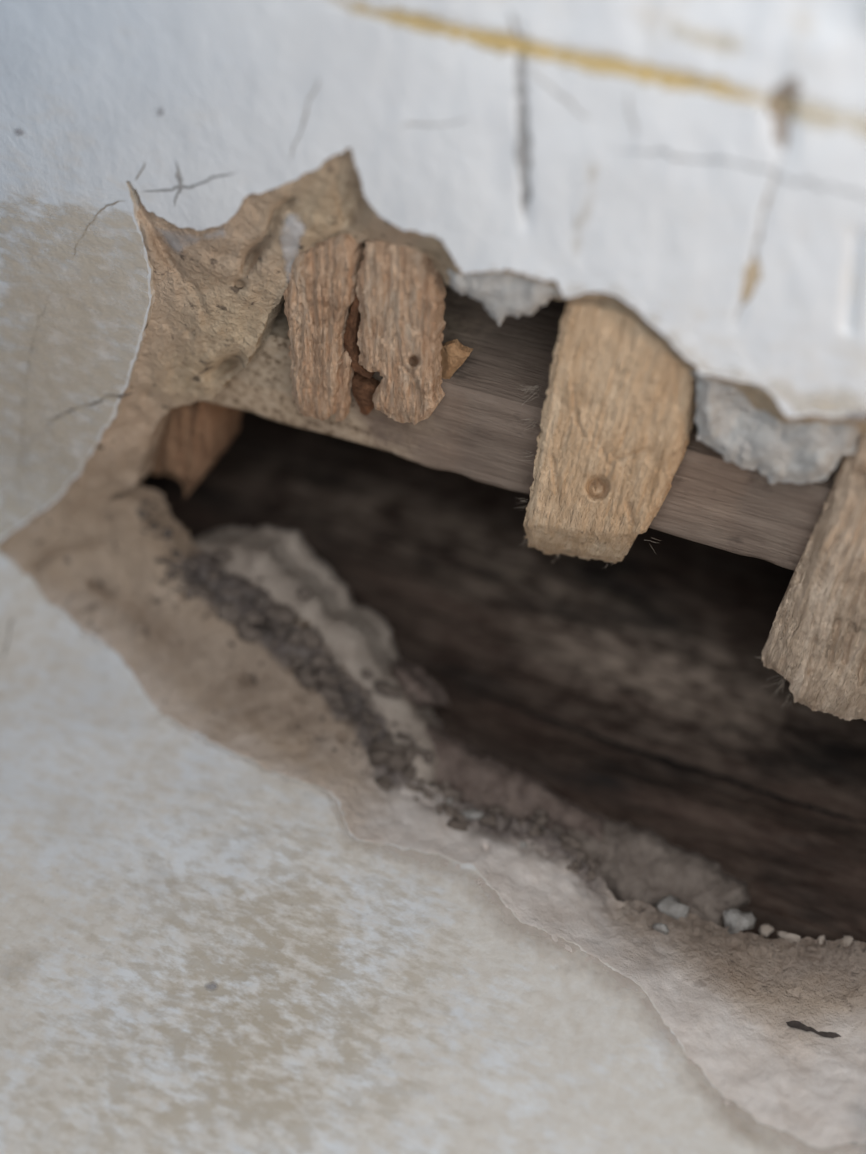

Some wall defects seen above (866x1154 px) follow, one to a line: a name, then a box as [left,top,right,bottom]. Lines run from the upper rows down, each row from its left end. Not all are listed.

spalling [165,232,179,250]
spalling [282,215,304,271]
spalling [447,269,560,326]
spalling [690,369,866,484]
spalling [217,600,265,643]
spalling [263,605,323,651]
spalling [287,652,356,714]
spalling [363,680,404,711]
spalling [389,660,450,709]
spalling [360,711,435,780]
spalling [375,775,393,791]
spalling [406,781,490,831]